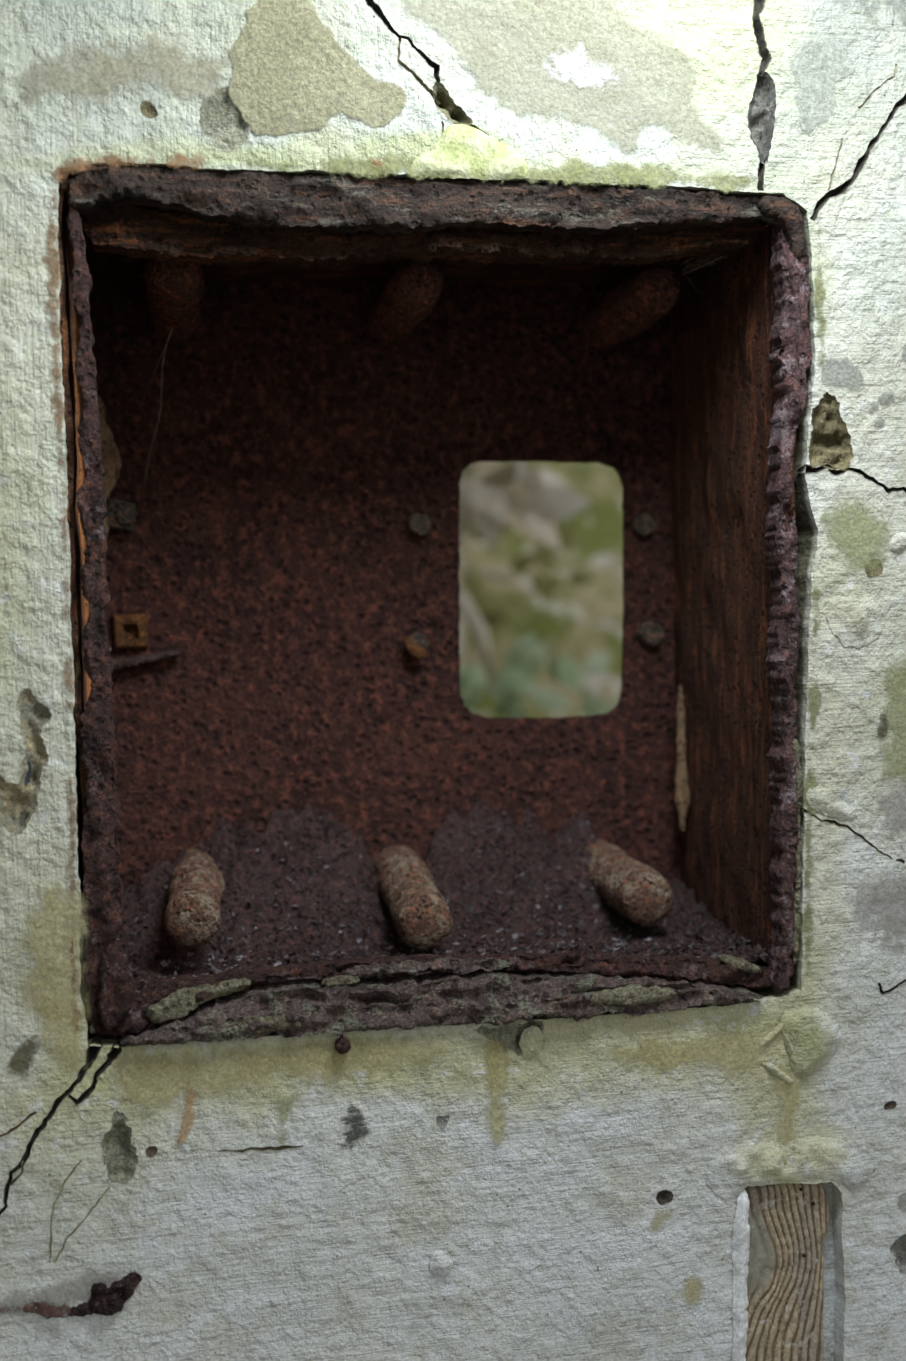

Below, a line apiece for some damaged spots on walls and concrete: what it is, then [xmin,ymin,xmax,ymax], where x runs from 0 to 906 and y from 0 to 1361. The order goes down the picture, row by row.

rust [168,153,205,169]
peeling [199,0,407,152]
crack [365,0,489,136]
damp [407,0,720,151]
crack [752,0,772,77]
crack [810,65,906,221]
rust [43,155,152,434]
spalling [808,357,864,471]
spalling [0,688,52,834]
crack [0,1036,123,1215]
damp [120,1039,445,1104]
damp [337,1106,372,1149]